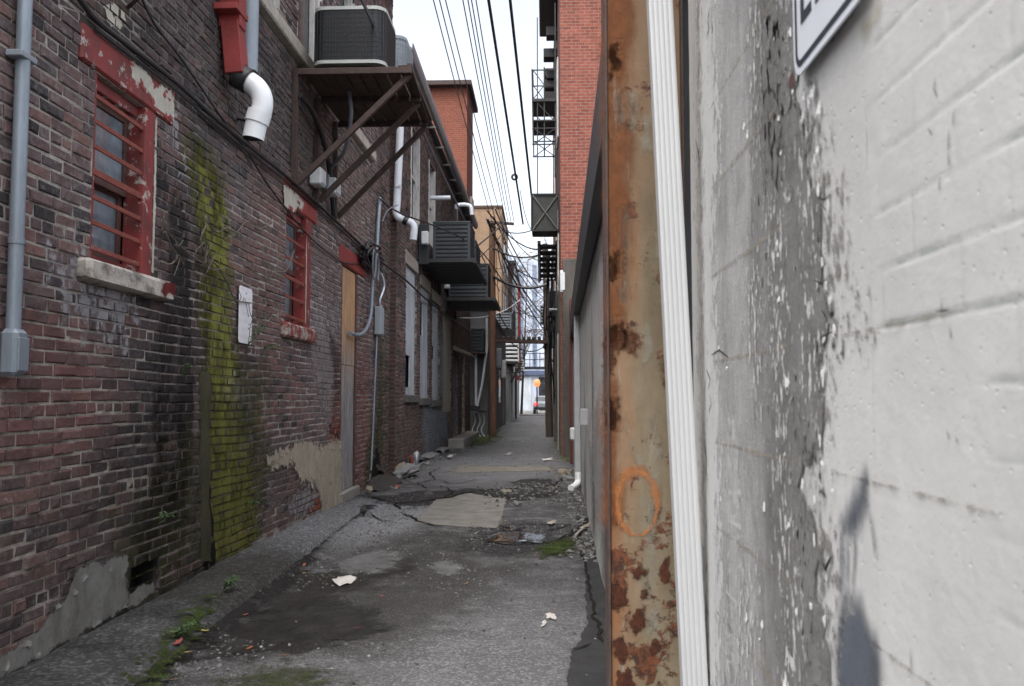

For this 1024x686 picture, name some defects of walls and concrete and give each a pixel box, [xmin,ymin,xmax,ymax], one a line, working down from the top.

peeling [283,184,305,213]
corrosion [601,0,639,523]
damp [128,134,271,604]
peeling [693,0,875,686]
peeling [264,419,343,514]
peeling [0,554,155,678]
corrosion [607,556,670,686]